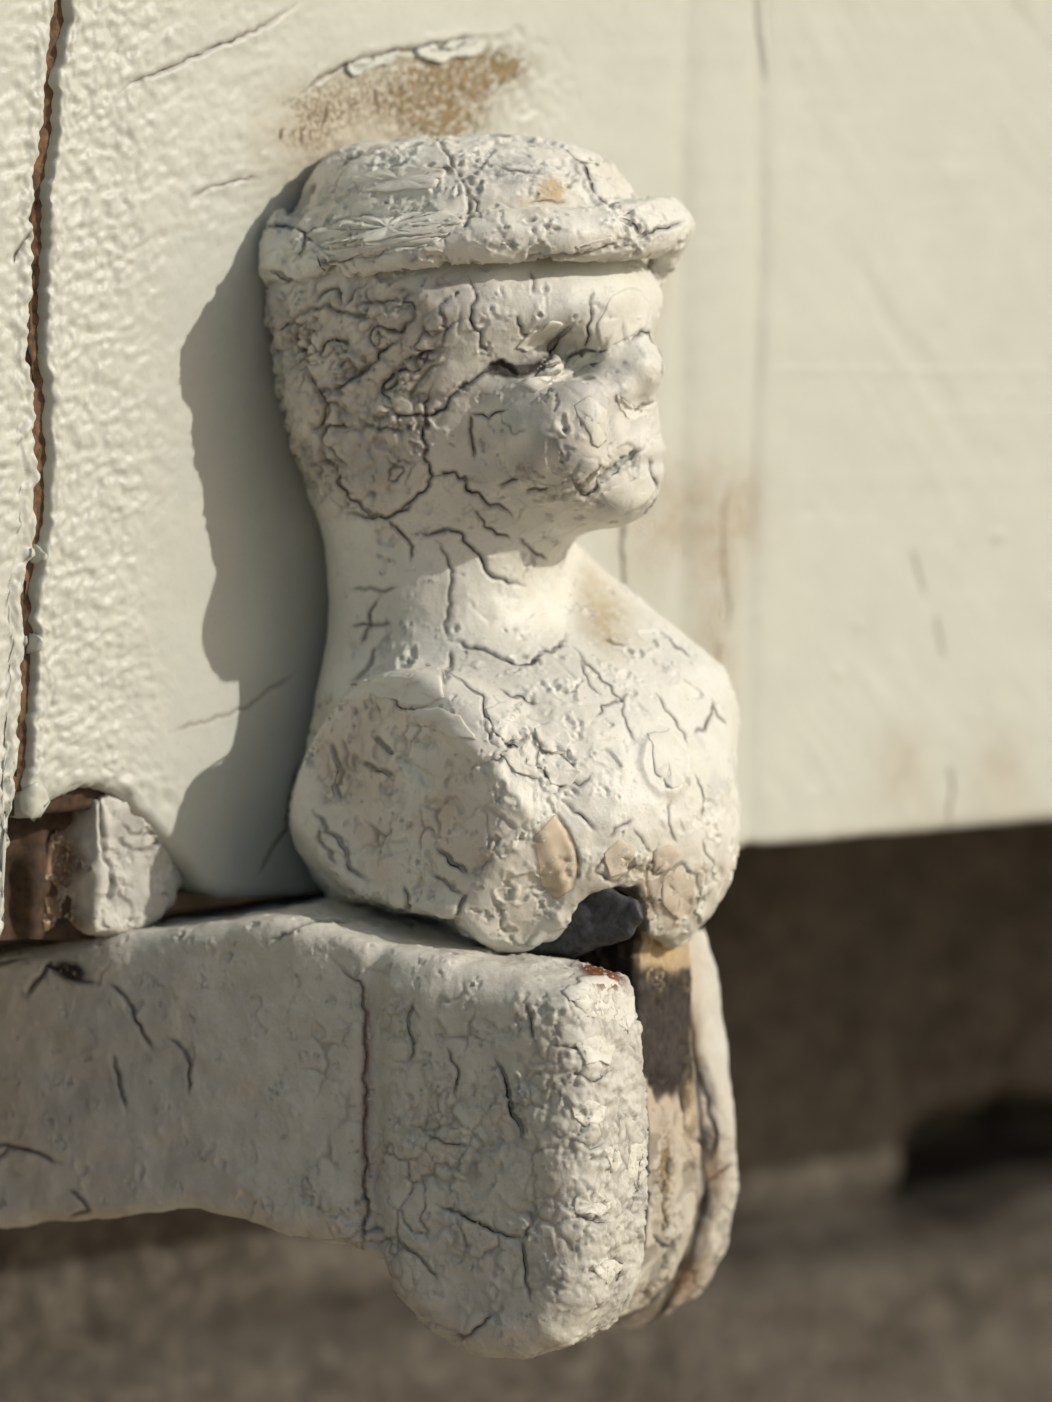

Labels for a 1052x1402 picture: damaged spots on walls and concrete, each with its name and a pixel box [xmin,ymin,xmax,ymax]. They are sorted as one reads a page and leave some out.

crack [128,8,291,85]
peeling [345,53,396,78]
peeling [413,37,486,63]
crack [584,161,682,238]
crack [265,215,369,282]
crack [13,0,64,792]
crack [303,276,719,916]
spalling [0,782,98,940]
spalling [54,962,85,980]
crack [331,958,369,1233]
crack [494,1057,522,1139]
crack [452,1211,531,1301]